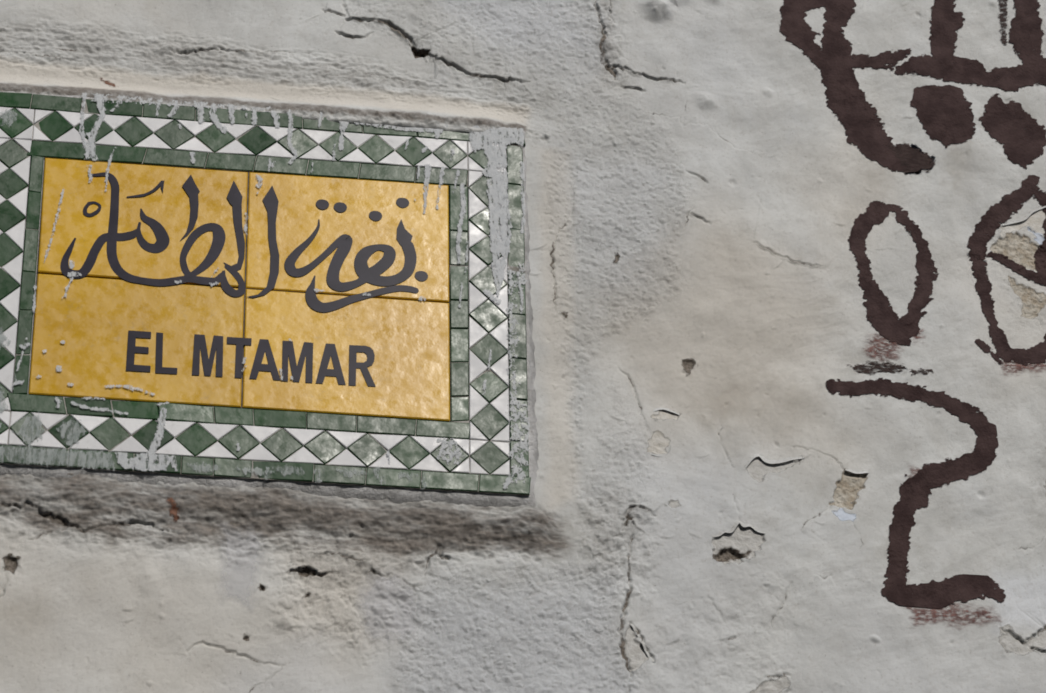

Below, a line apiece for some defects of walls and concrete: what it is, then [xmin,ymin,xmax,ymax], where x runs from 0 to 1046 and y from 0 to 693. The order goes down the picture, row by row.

crack [331,12,411,45]
crack [594,4,637,90]
peeling [990,206,1046,271]
peeling [1008,276,1046,319]
peeling [829,469,869,521]
spalling [712,521,766,564]
crack [619,508,645,671]